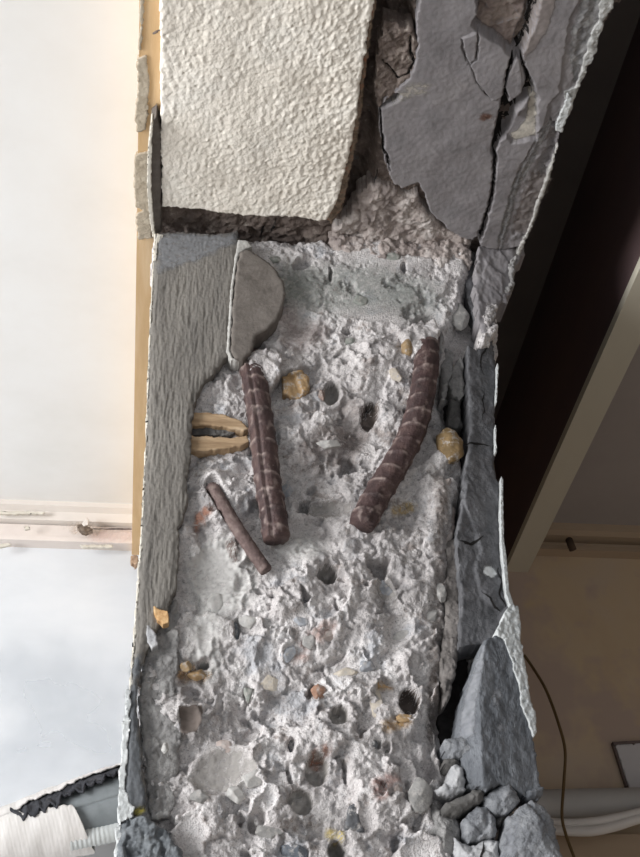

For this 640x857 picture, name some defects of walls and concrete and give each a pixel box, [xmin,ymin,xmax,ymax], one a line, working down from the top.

crack [462,0,536,235]
spalling [114,0,481,857]
peeling [492,476,537,738]